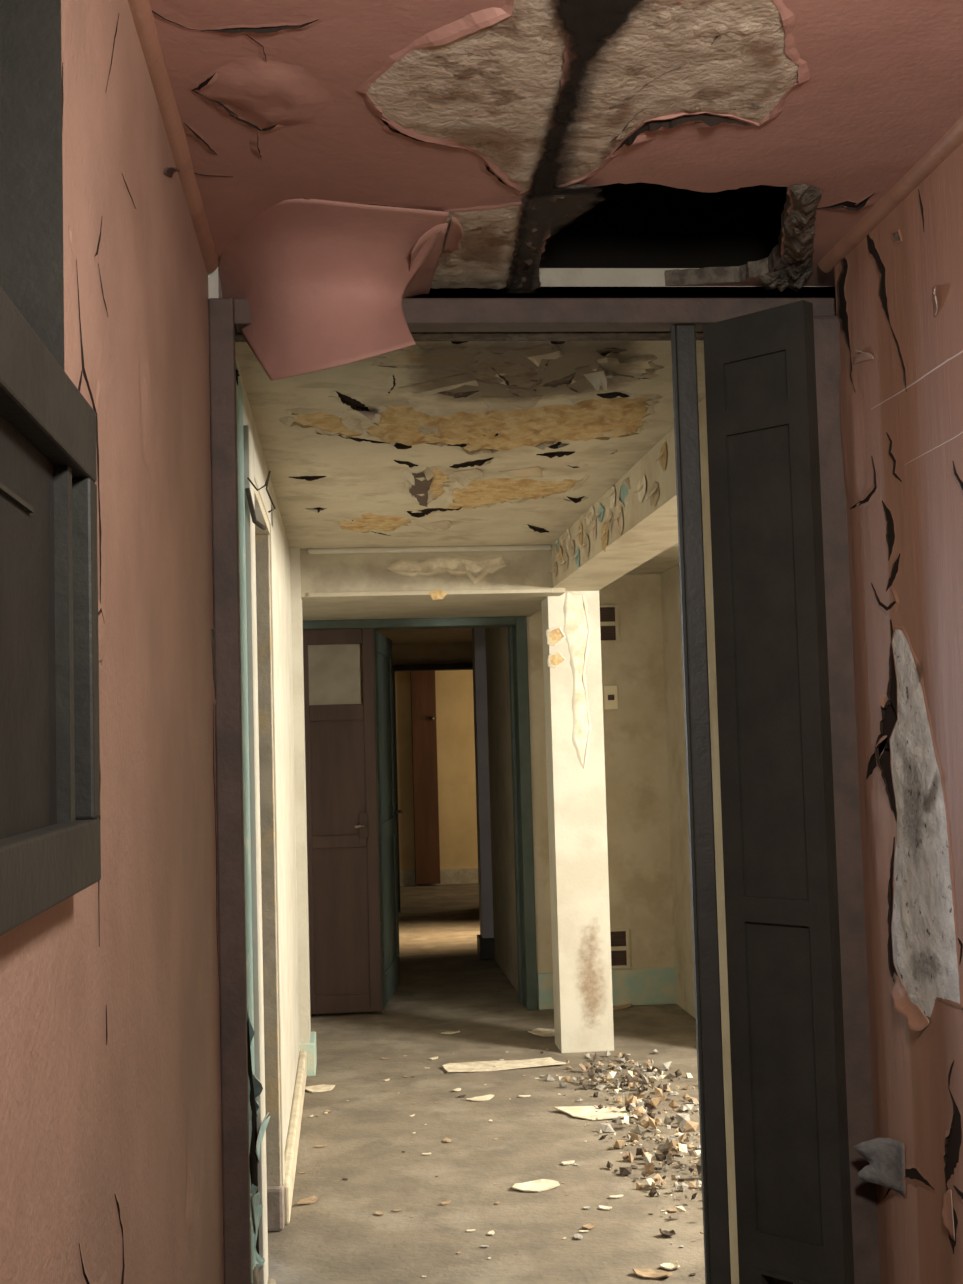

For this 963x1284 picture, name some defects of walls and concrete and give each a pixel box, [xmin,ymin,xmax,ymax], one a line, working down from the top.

crack [182,73,283,178]
crack [151,7,322,63]
peeling [218,0,811,381]
water stain [508,0,640,293]
spalling [758,184,823,292]
crack [816,192,908,394]
crack [68,214,108,615]
spalling [279,354,664,533]
peeling [866,619,963,1031]
crack [78,1190,125,1284]
peeling [256,1112,270,1162]
crack [884,1057,963,1254]